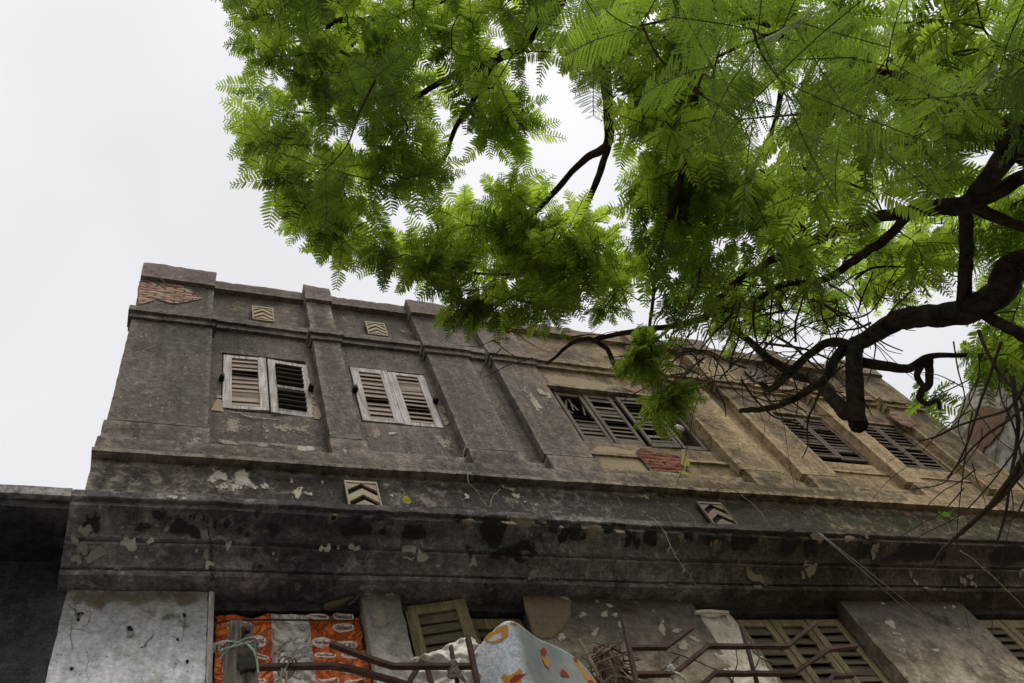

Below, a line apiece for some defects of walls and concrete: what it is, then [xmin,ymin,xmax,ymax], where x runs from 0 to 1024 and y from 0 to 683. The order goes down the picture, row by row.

flaking render [70,512,122,570]
spalling [120,510,250,569]
spalling [677,527,767,589]
spalling [782,528,824,579]
spalling [845,531,946,589]
spalling [990,542,1024,578]
peeling [591,600,622,639]
peeling [652,610,701,650]